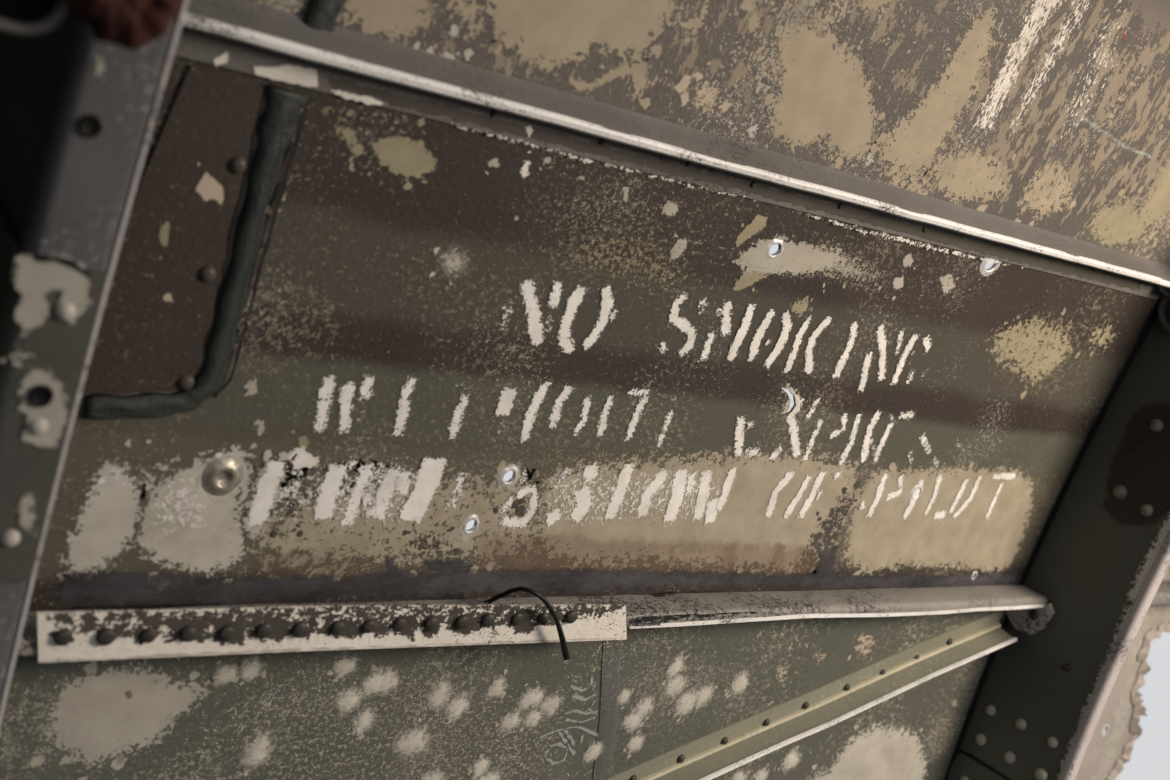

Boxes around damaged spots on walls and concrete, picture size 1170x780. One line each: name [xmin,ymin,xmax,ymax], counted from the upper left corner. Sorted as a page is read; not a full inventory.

peeling [253,65,437,190]
peeling [384,124,755,338]
peeling [0,253,92,449]
peeling [15,492,38,537]
peeling [56,373,1037,582]
peeling [848,632,876,660]
peeling [24,648,579,780]
peeling [806,699,966,780]